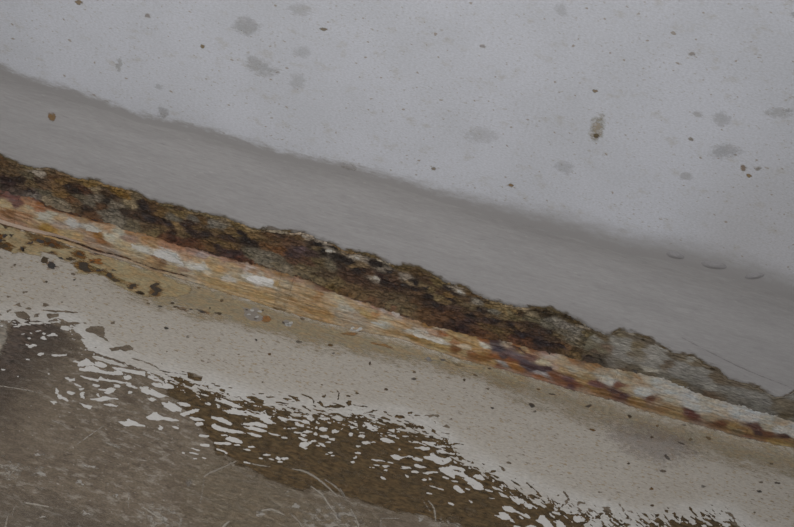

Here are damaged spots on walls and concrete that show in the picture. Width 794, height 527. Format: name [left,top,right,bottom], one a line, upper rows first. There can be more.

corrosion [0,190,794,448]
damp [160,363,735,527]